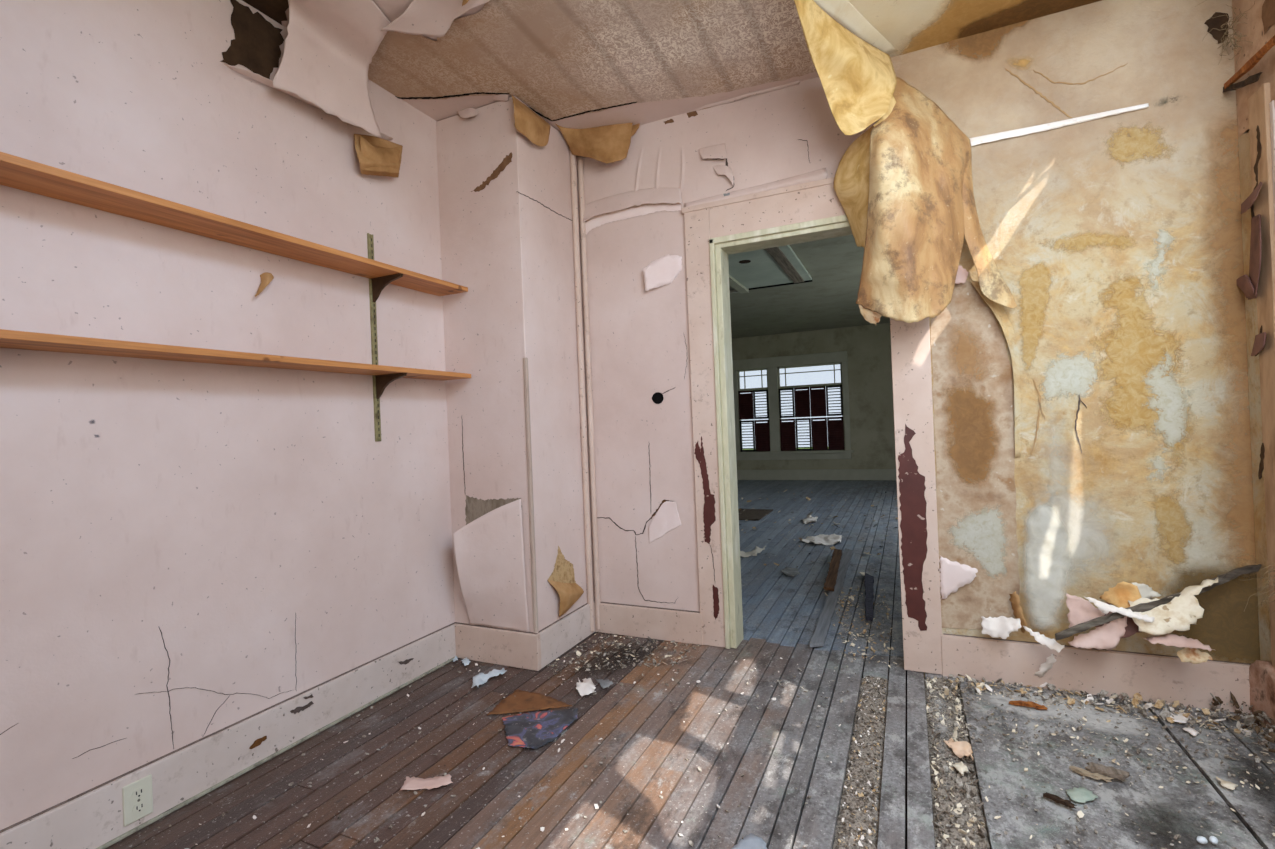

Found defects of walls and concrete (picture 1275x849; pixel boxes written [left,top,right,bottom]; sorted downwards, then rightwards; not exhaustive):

damp [901,0,1102,59]
damp [1005,59,1128,119]
flaking render [465,495,522,525]
flaking render [548,546,576,583]
crack [597,446,678,603]
peeling [694,436,716,544]
flaking render [898,280,1020,631]
damp [946,328,996,484]
crack [139,619,297,748]